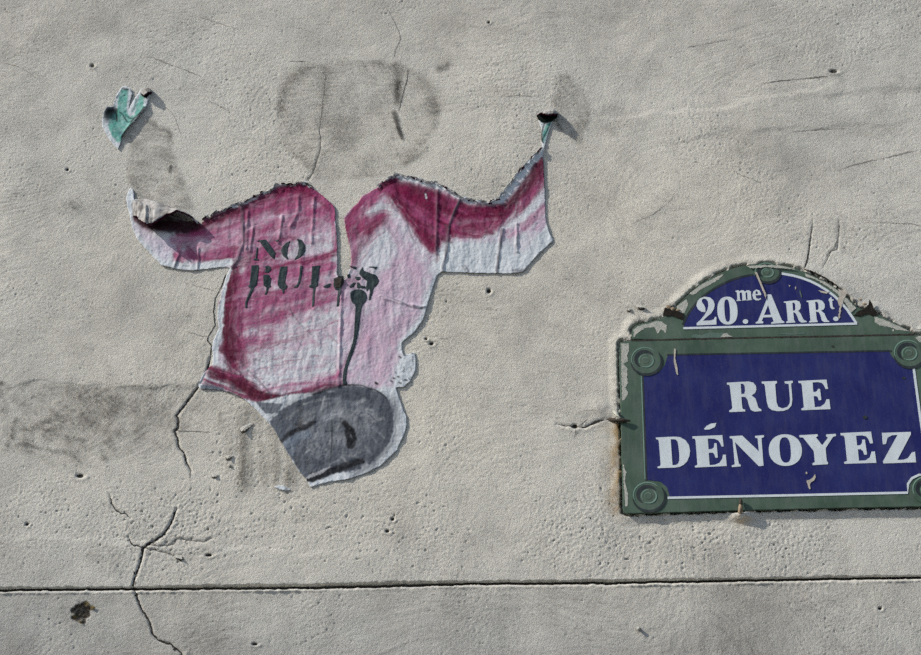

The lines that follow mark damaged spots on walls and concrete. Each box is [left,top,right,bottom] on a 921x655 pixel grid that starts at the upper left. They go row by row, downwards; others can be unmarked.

crack [174,274,226,478]
crack [559,418,608,437]
spalling [71,602,95,624]
crack [129,511,209,655]